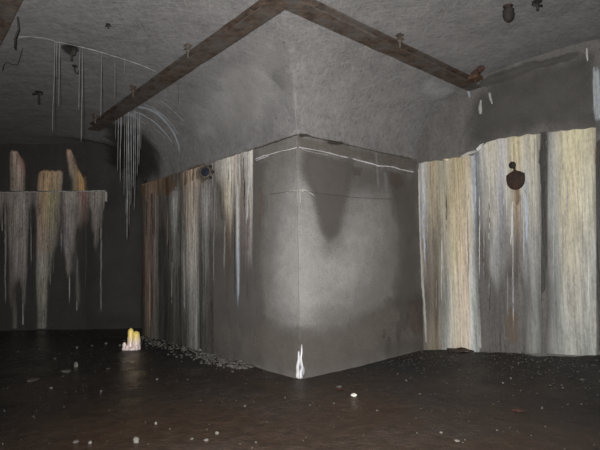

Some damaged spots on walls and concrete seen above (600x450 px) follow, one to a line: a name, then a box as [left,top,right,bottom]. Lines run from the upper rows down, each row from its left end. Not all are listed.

leakage [0,43,600,379]
crack [254,133,414,173]